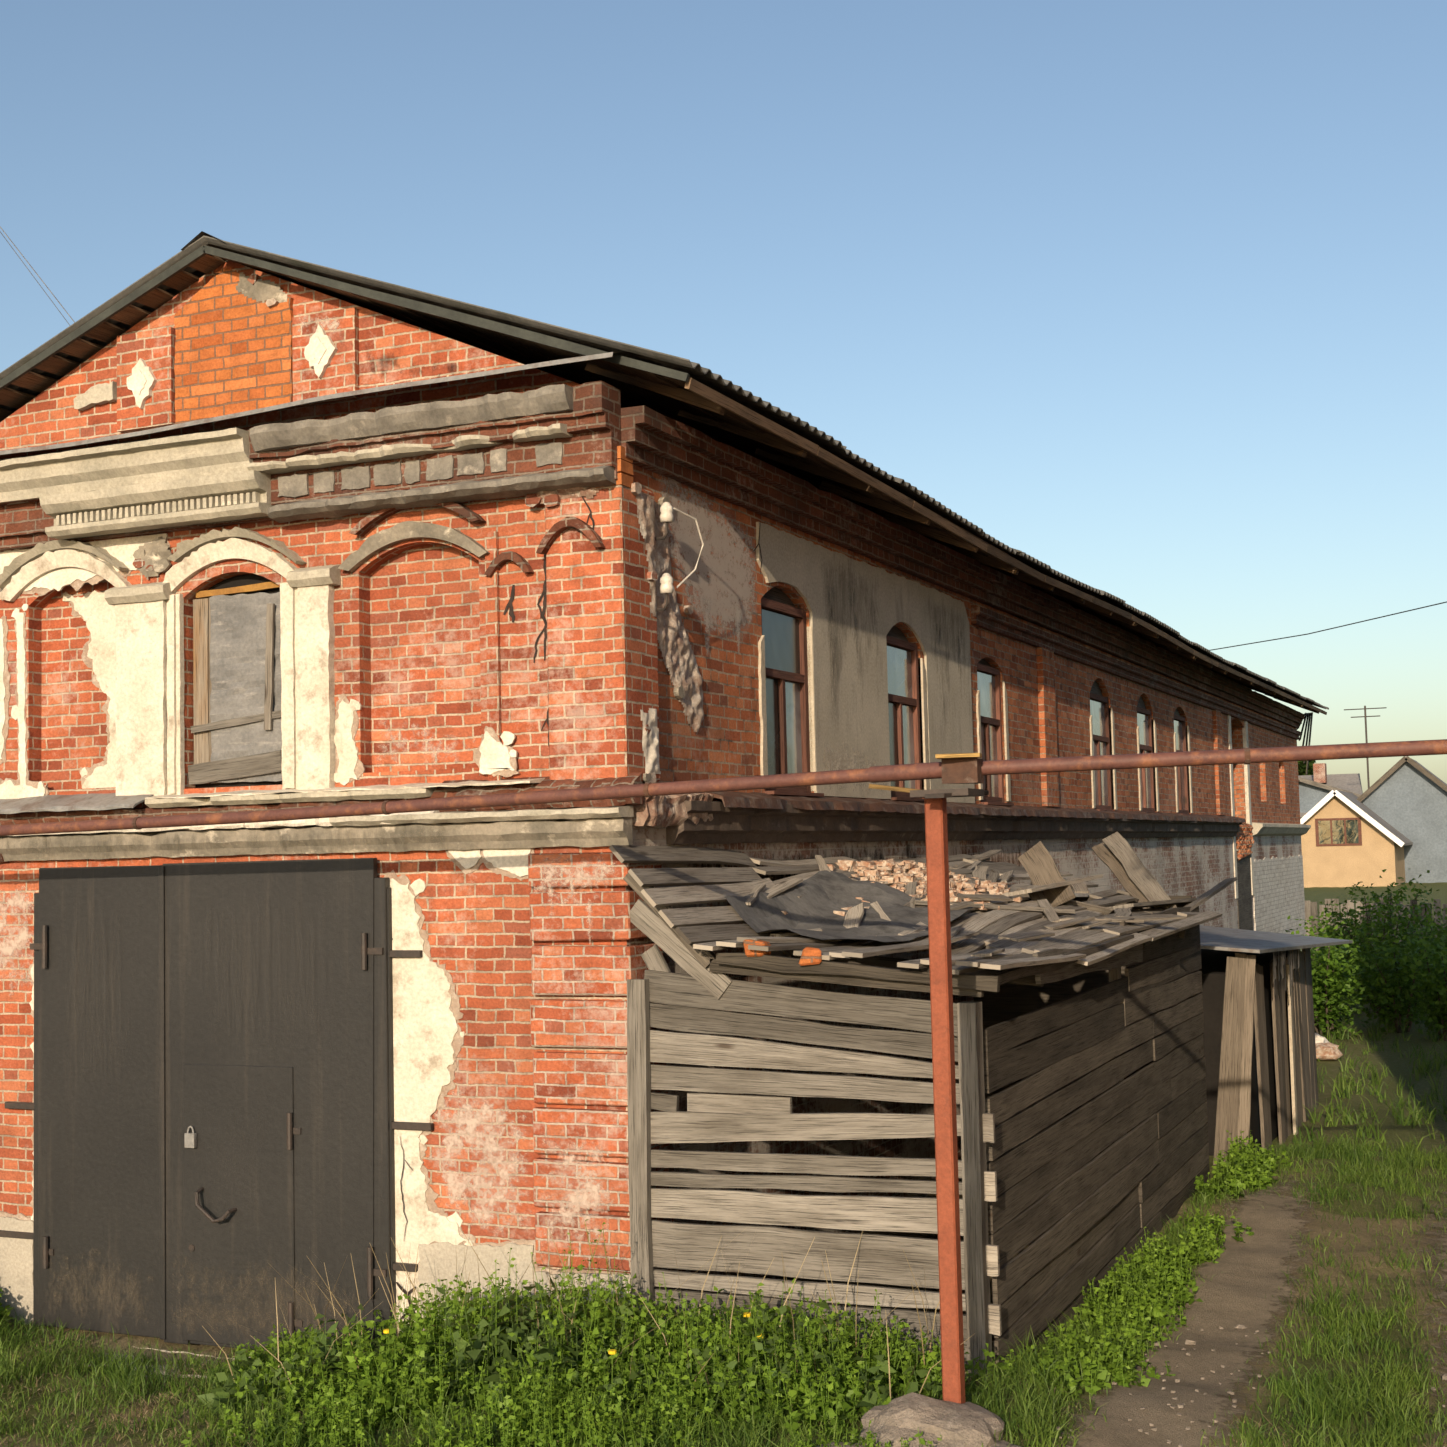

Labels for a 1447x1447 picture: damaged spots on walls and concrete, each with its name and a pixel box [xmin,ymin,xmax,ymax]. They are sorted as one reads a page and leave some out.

peeling [0,533,172,799]
peeling [334,694,365,786]
peeling [473,726,519,777]
spalling [640,708,661,783]
peeling [631,474,755,735]
peeling [384,870,476,1334]